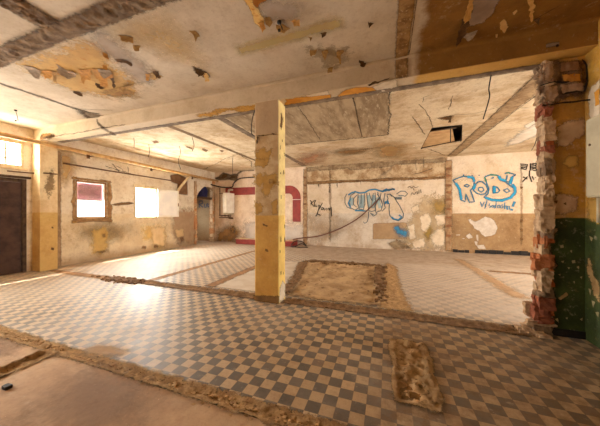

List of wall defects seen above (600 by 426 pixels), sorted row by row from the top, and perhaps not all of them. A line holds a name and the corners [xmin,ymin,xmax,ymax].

peeling [0,0,177,97]
peeling [244,0,300,33]
peeling [456,0,500,47]
peeling [39,105,255,143]
peeling [209,148,284,242]
spalling [280,59,600,336]